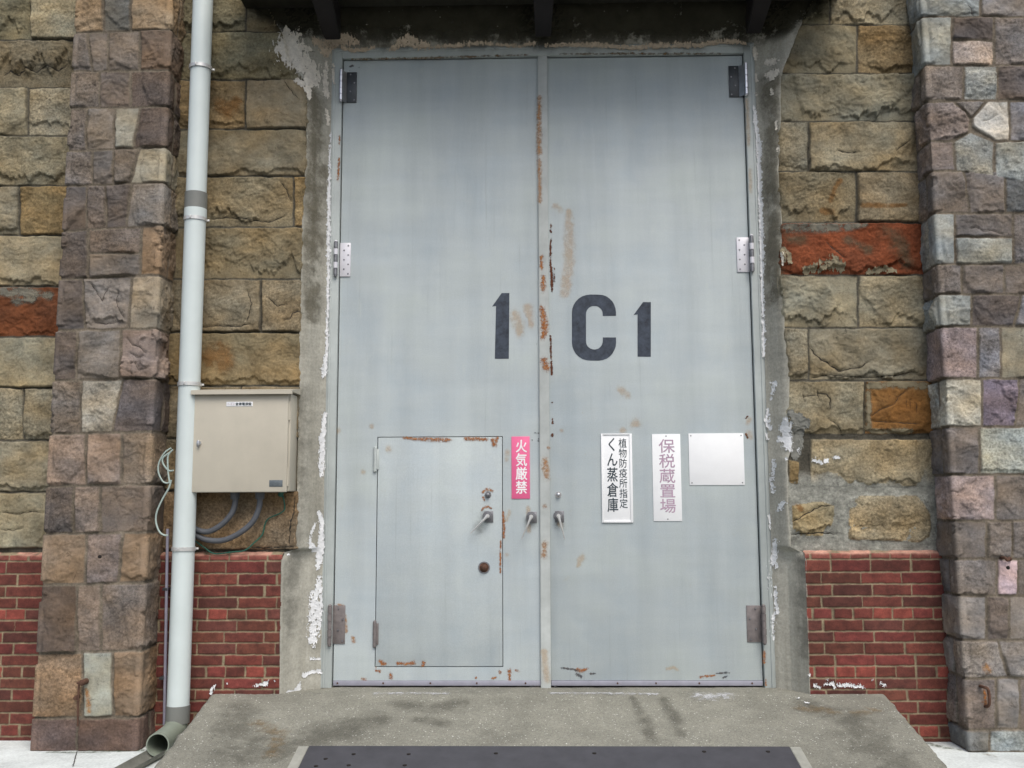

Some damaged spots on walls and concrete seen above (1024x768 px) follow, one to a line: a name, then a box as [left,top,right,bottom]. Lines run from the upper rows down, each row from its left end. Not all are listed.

peeling [269,25,780,379]
rust [540,225,555,292]
spalling [780,247,846,275]
rust [539,306,553,375]
rust [481,488,505,573]
peeling [764,380,840,641]
peeling [286,510,325,693]